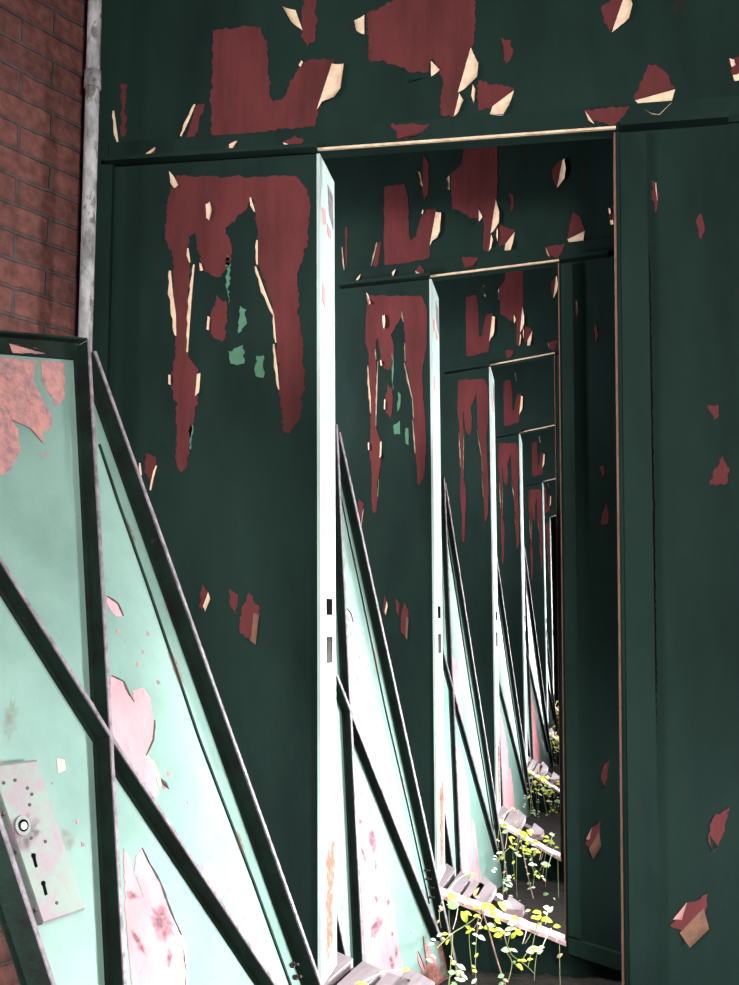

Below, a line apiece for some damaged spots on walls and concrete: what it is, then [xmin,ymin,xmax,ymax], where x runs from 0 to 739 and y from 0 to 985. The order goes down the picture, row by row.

peeling [180,25,344,148]
peeling [354,0,514,117]
peeling [601,0,632,33]
peeling [371,154,441,276]
peeling [445,146,515,268]
peeling [165,172,348,472]
peeling [358,294,439,527]
peeling [457,373,551,583]
peeling [110,675,171,798]
peeling [123,848,188,985]
peeling [356,788,402,977]
peeling [670,894,709,947]